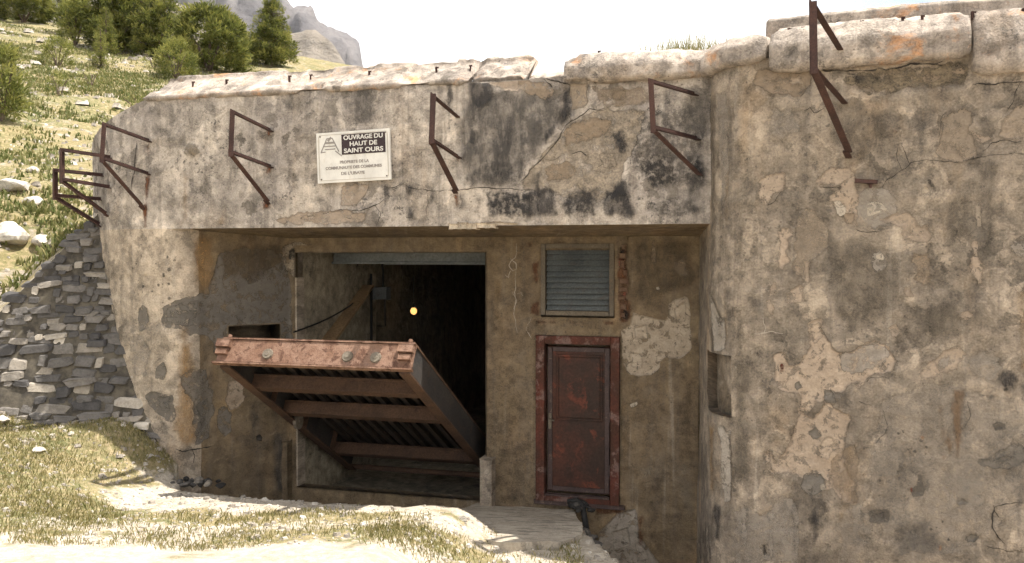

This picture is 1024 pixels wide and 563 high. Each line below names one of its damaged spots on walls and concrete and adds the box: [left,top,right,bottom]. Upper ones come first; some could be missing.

crack [300,108,613,221]
water stain [464,82,634,218]
flaking render [758,172,786,205]
flaking render [816,166,931,243]
crack [882,140,1022,187]
flaking render [138,242,306,445]
flaking render [606,296,692,377]
spalling [765,318,900,504]